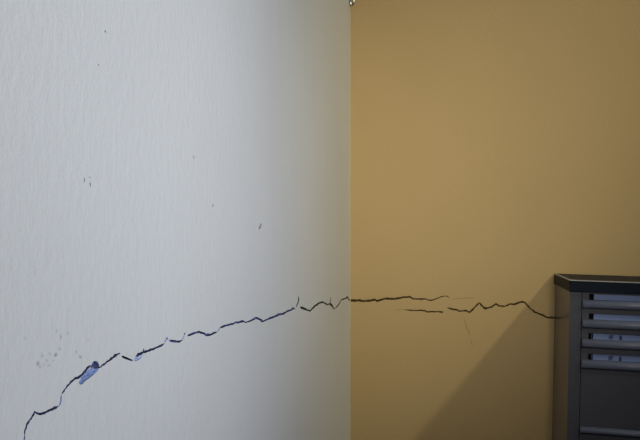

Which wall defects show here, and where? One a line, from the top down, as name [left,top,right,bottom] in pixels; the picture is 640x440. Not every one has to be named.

flaking render [79,361,99,385]
crack [24,296,554,440]